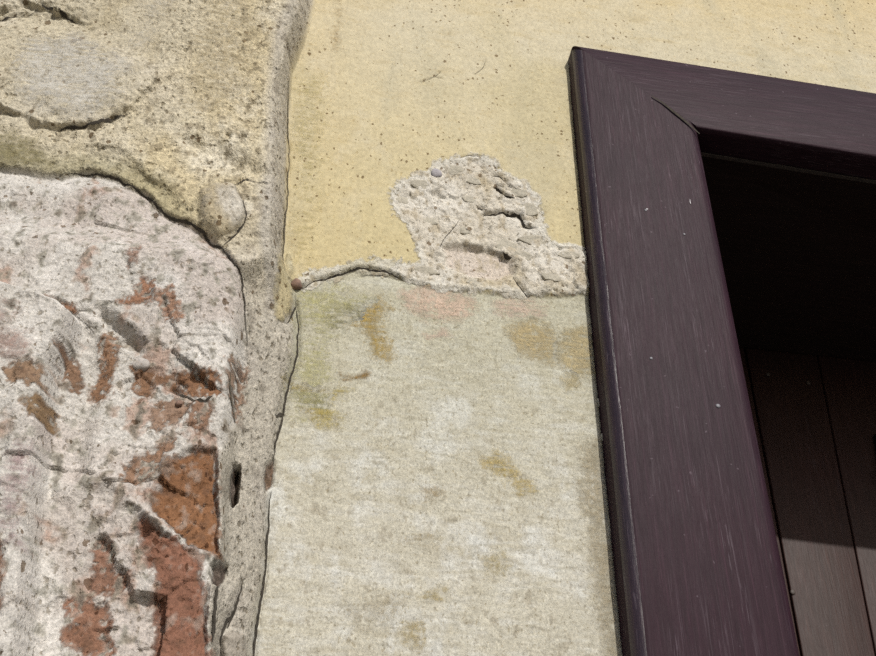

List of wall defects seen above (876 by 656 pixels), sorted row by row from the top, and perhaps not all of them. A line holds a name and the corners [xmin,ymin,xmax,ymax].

crack [0,1,79,25]
peeling [2,359,59,434]
peeling [52,333,122,402]
peeling [119,277,184,320]
peeling [129,356,249,435]
damp [360,303,391,359]
flaking render [250,153,622,656]
damp [499,300,596,389]
spalling [231,472,239,508]
peeling [120,438,227,656]
peeling [60,540,129,656]